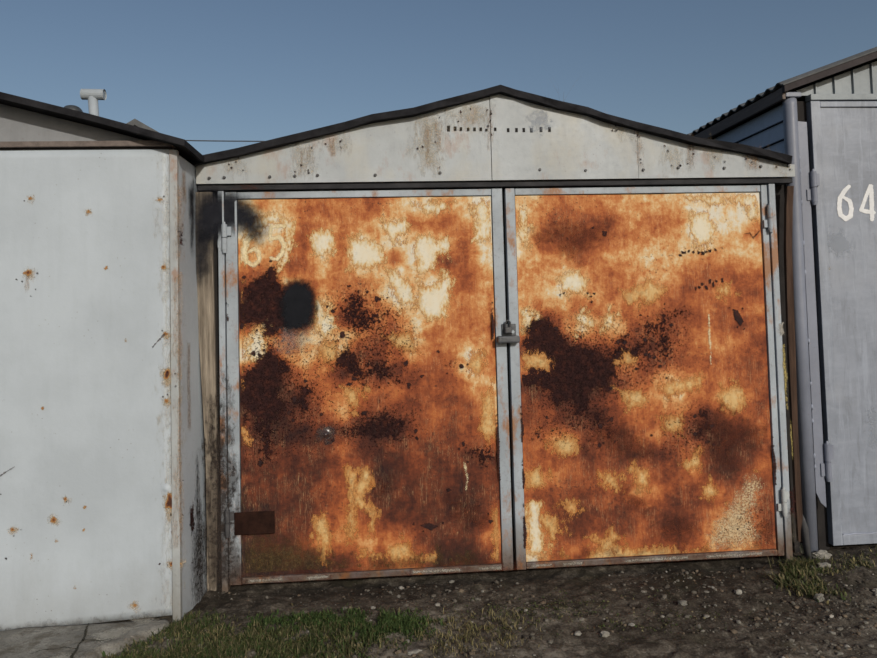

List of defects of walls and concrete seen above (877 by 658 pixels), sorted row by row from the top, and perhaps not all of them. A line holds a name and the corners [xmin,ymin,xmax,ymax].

corrosion [240,260,316,467]
corrosion [326,285,411,389]
corrosion [332,408,419,448]
corrosion [458,442,498,467]
corrosion [521,304,685,452]
crack [31,626,111,658]